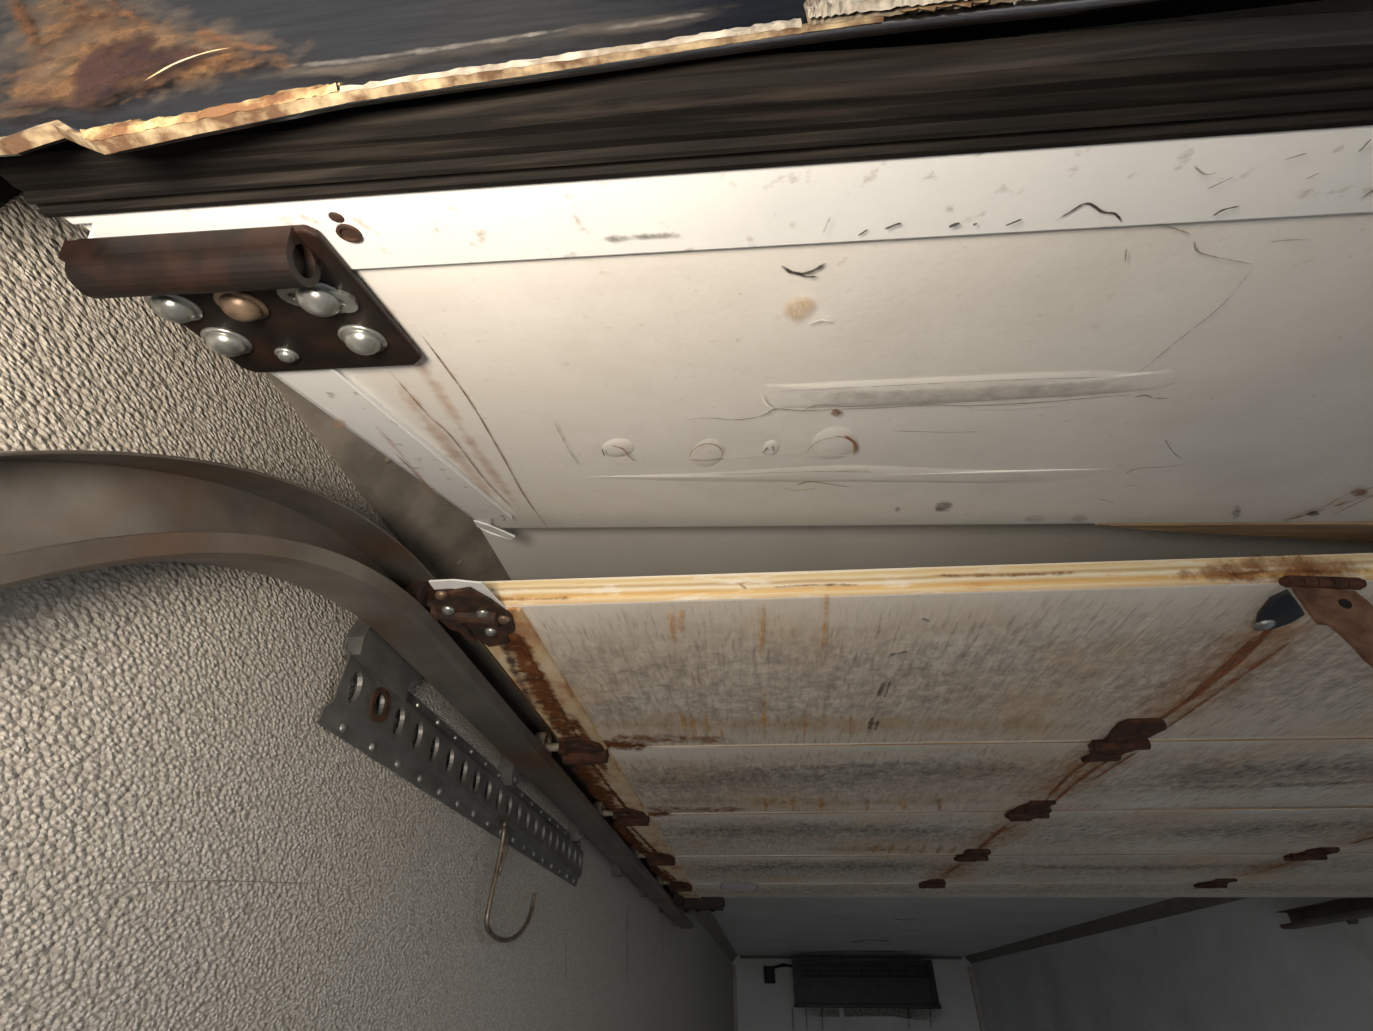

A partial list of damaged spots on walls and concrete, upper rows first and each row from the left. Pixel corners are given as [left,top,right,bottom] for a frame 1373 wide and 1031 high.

rust [0,0,273,112]
rust [1182,555,1356,582]
rust [500,633,1324,811]
rust [1150,627,1373,742]
rust [573,764,676,882]